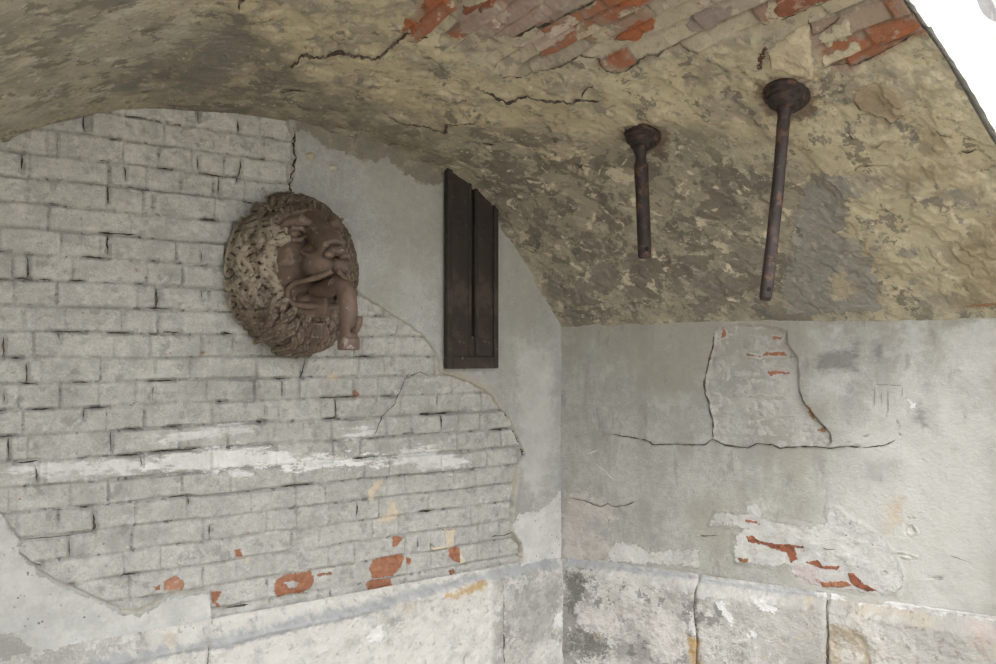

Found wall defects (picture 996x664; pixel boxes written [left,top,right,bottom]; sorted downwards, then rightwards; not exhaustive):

crack [280,33,428,94]
flaking render [399,0,660,54]
crack [389,44,715,146]
flaking render [680,0,738,36]
flaking render [767,0,922,80]
flaking render [845,77,912,127]
crack [288,128,297,192]
crack [374,371,429,435]
flaking render [0,108,920,646]
crack [614,334,895,449]
peeling [570,587,698,664]
spalling [812,607,890,664]